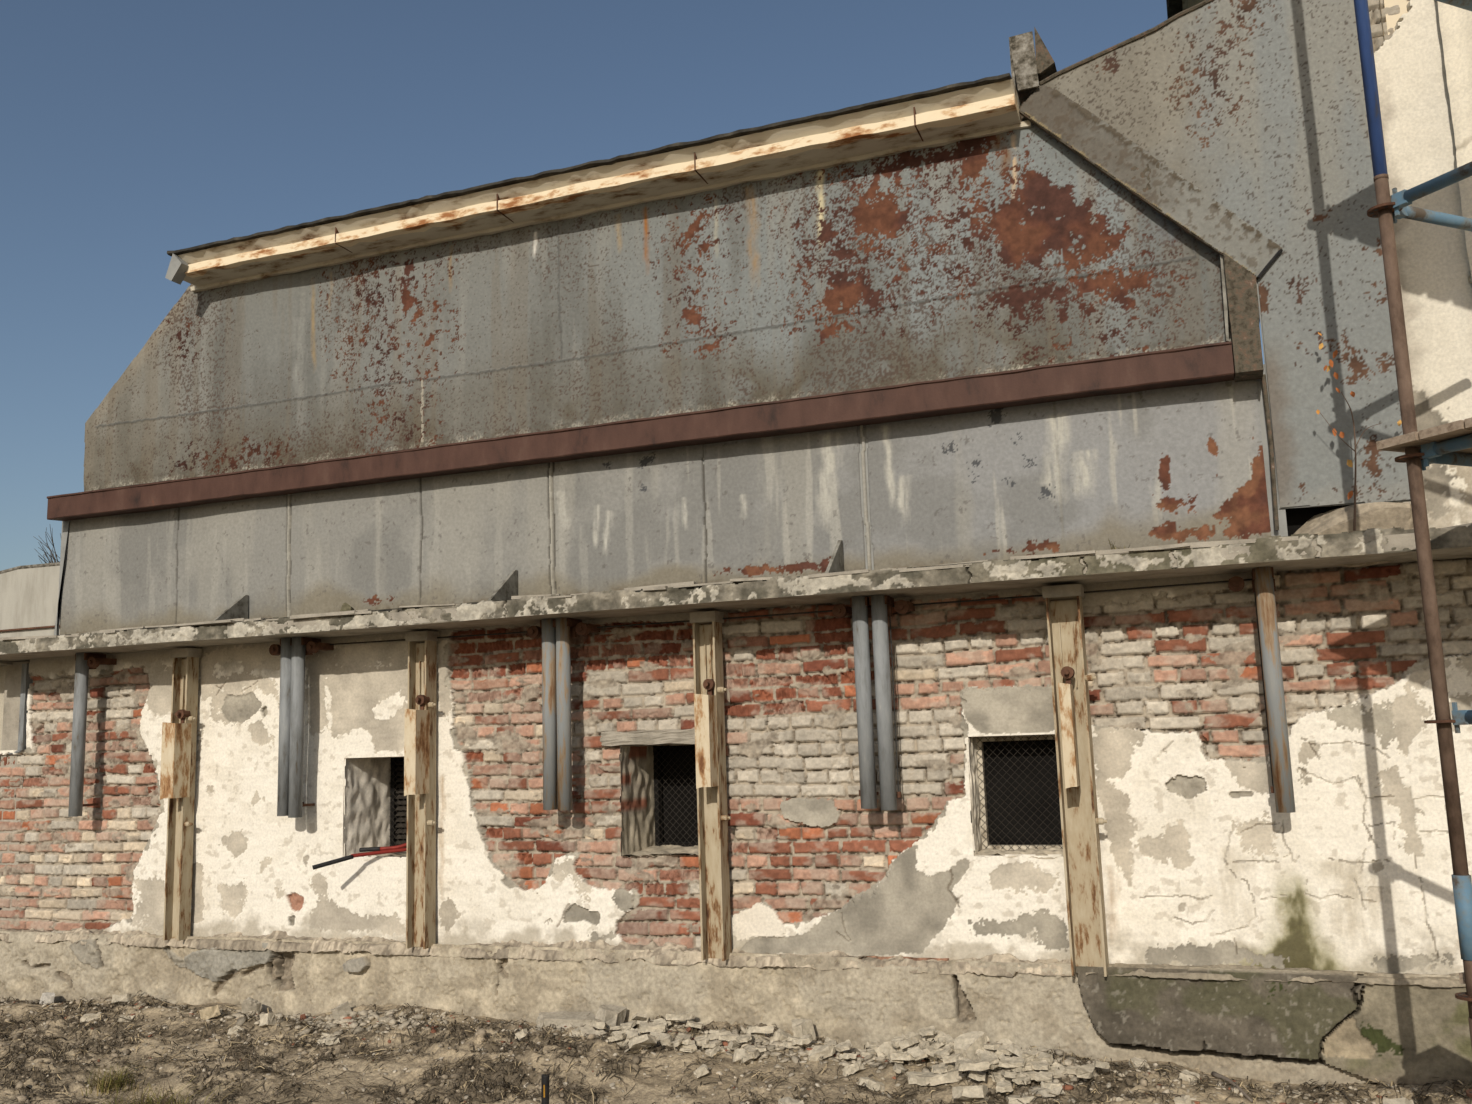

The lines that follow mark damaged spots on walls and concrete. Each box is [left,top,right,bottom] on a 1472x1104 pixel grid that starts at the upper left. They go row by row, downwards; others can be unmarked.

rust [1164,0,1276,151]
rust [310,240,467,454]
rust [641,123,1195,366]
flaking render [0,611,423,958]
flaking render [436,559,1071,965]
peeling [1097,543,1249,571]
flaking render [1083,584,1282,886]
crack [1157,731,1210,761]
rust [1149,436,1271,543]
crack [1140,737,1464,959]
flaking render [1274,463,1472,856]
crack [1114,974,1365,1064]